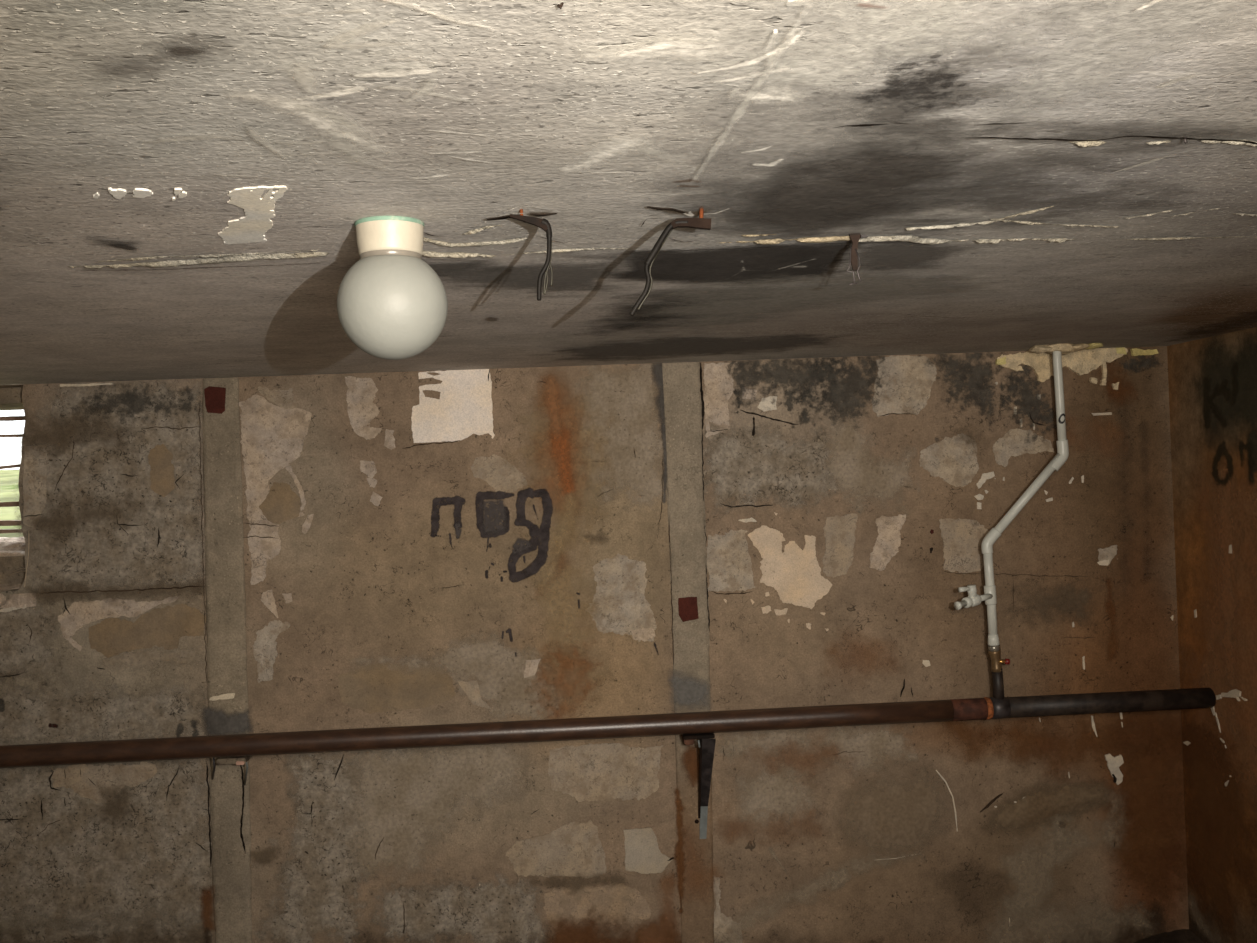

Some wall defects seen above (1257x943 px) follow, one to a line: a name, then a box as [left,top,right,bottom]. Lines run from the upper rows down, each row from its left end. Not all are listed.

crack [977,123,1257,144]
damp [728,356,884,424]
flaking render [871,355,937,417]
damp [929,352,1056,439]
peeling [0,382,207,745]
flaking render [239,386,314,683]
flaking render [588,553,657,642]
peeling [703,361,858,631]
flaking render [869,514,906,571]
flaking render [919,407,1054,573]
flaking render [1104,753,1124,785]
rust [553,790,685,943]